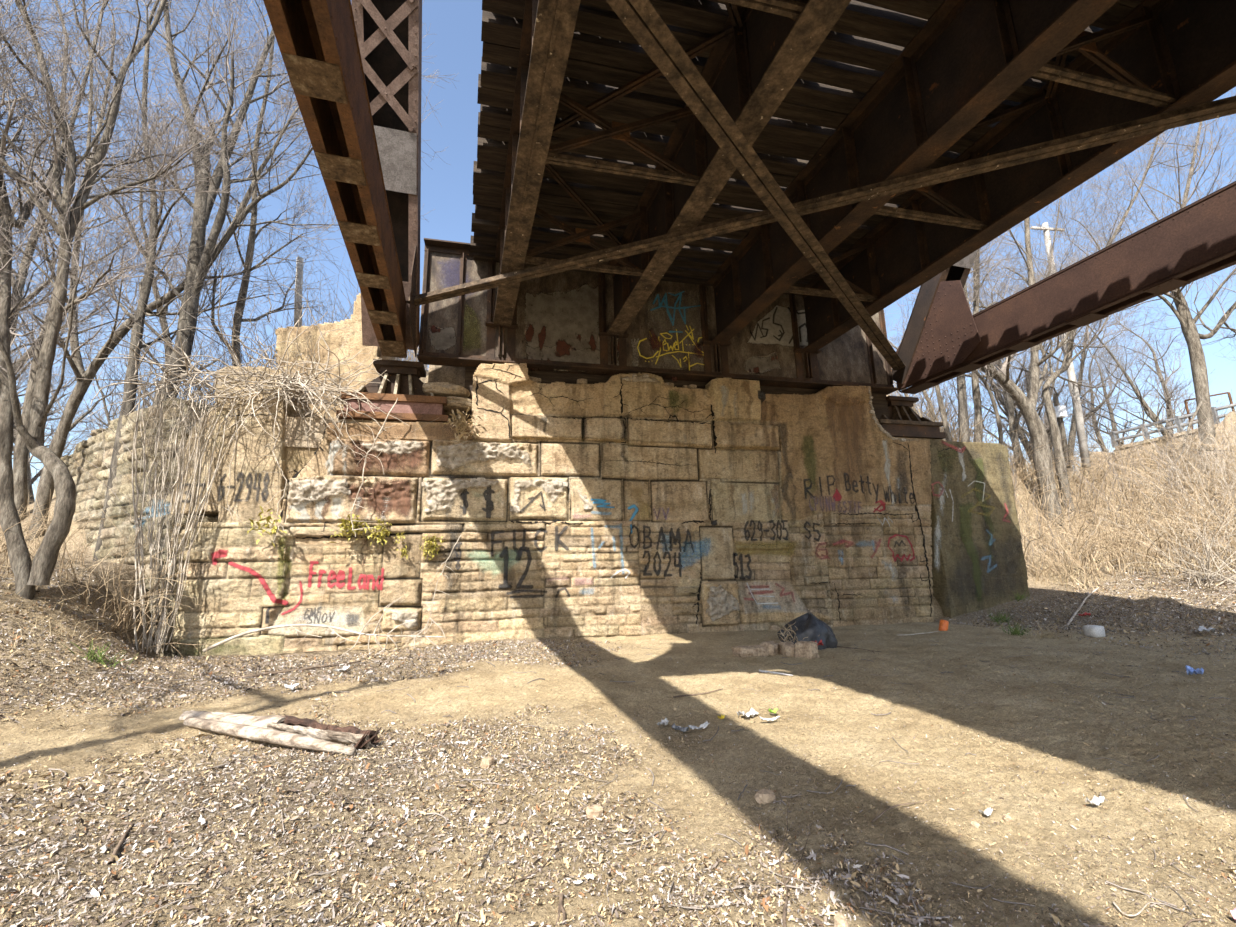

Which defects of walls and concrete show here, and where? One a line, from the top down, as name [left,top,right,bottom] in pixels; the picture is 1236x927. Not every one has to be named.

crack [475,364,717,466]
spalling [869,387,906,442]